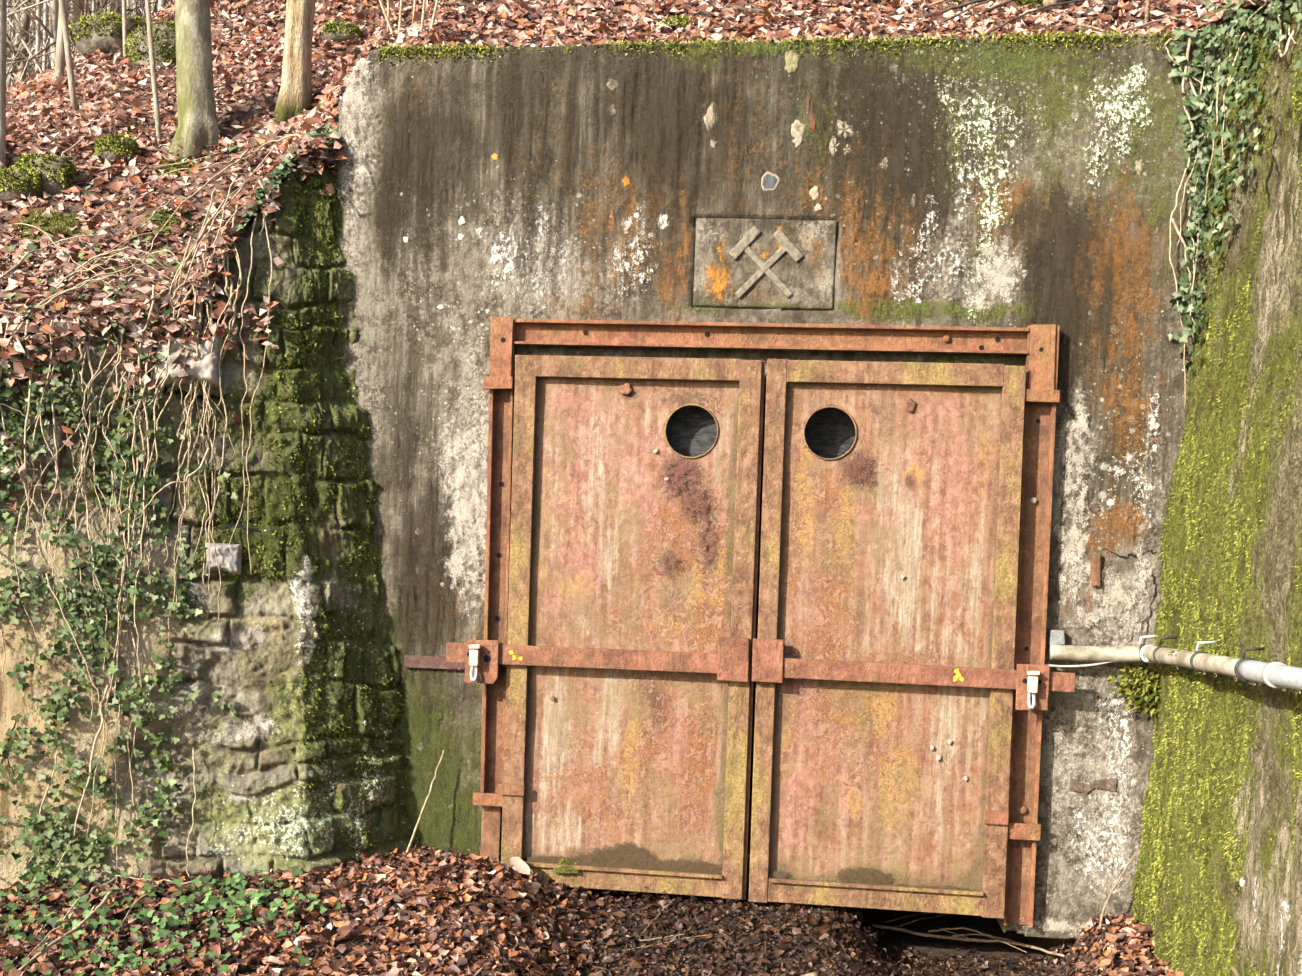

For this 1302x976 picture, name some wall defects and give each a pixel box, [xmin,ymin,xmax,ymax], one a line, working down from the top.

water stain [374,73,470,314]
water stain [489,24,806,293]
rust [840,196,892,320]
water stain [796,46,1175,533]
water stain [386,373,482,779]